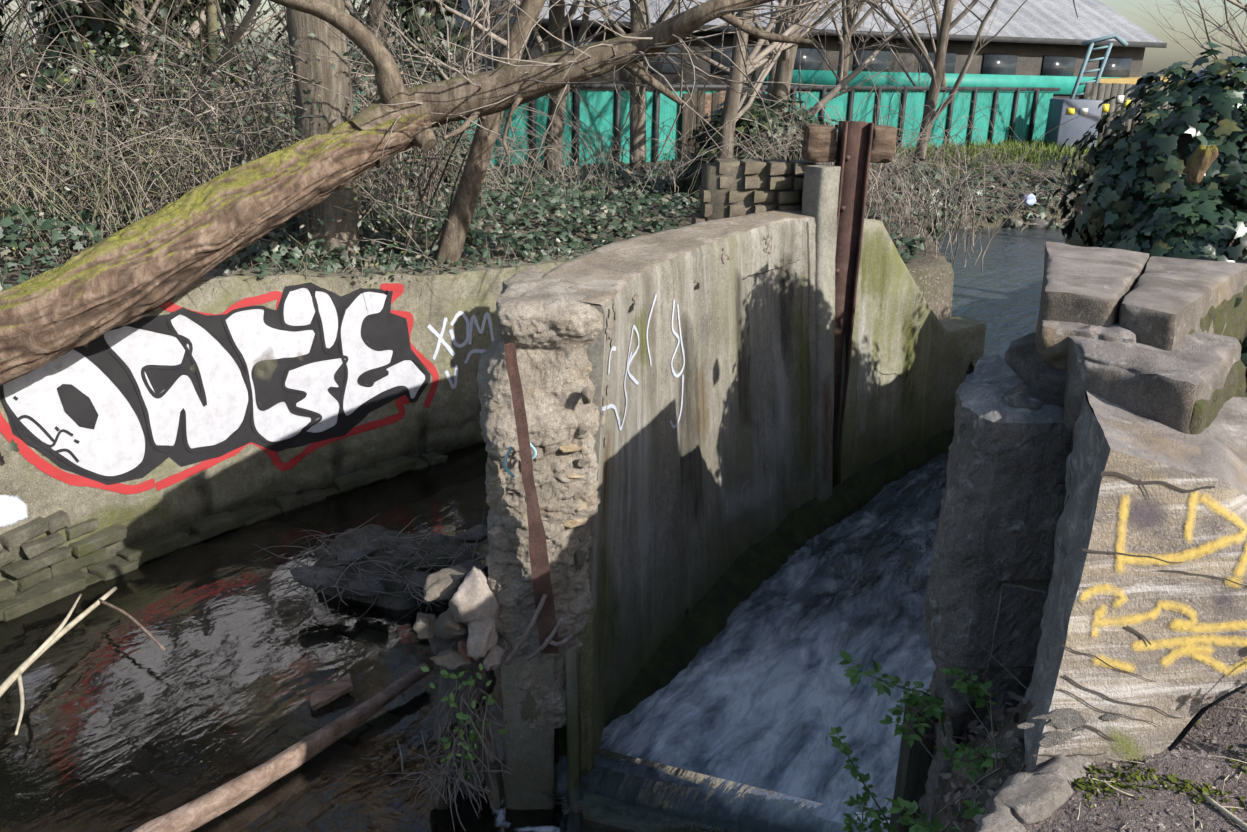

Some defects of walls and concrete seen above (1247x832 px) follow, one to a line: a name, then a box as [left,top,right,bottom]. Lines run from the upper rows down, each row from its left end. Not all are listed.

water stain [738,280,750,418]